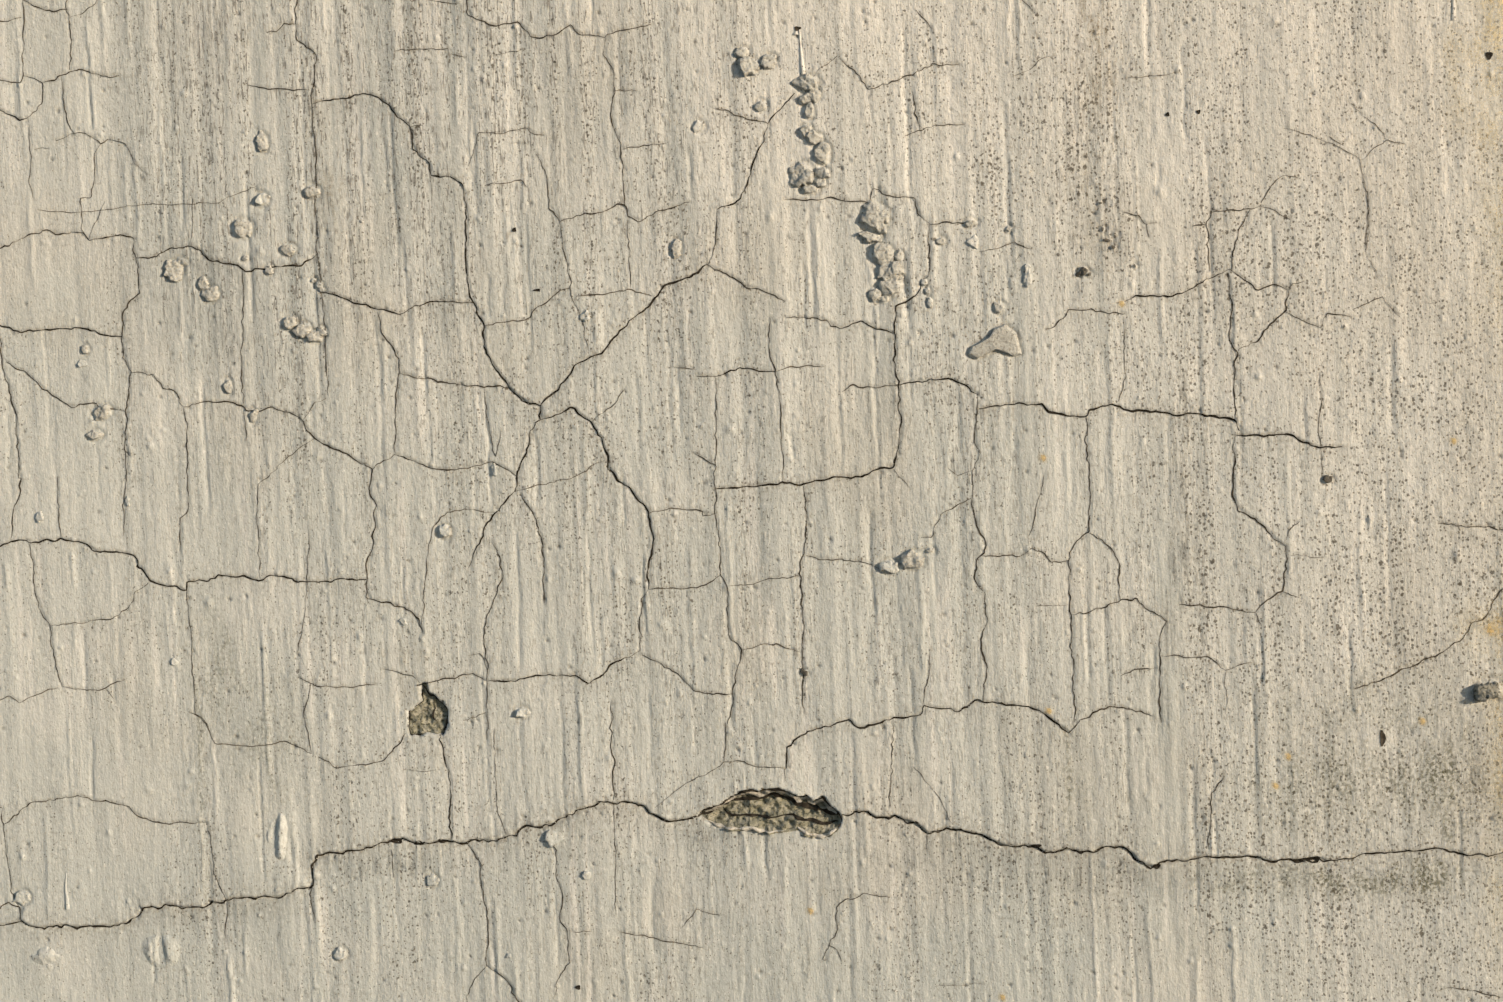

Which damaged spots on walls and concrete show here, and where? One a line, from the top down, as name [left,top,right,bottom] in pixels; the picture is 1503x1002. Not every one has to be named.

crack [1291,107,1404,273]
crack [0,0,1350,809]
crack [1355,589,1503,689]
spalling [408,682,448,736]
crack [0,706,702,1002]
spalling [700,787,842,839]
crack [842,768,1503,870]
crack [622,909,718,948]
crack [822,893,890,961]